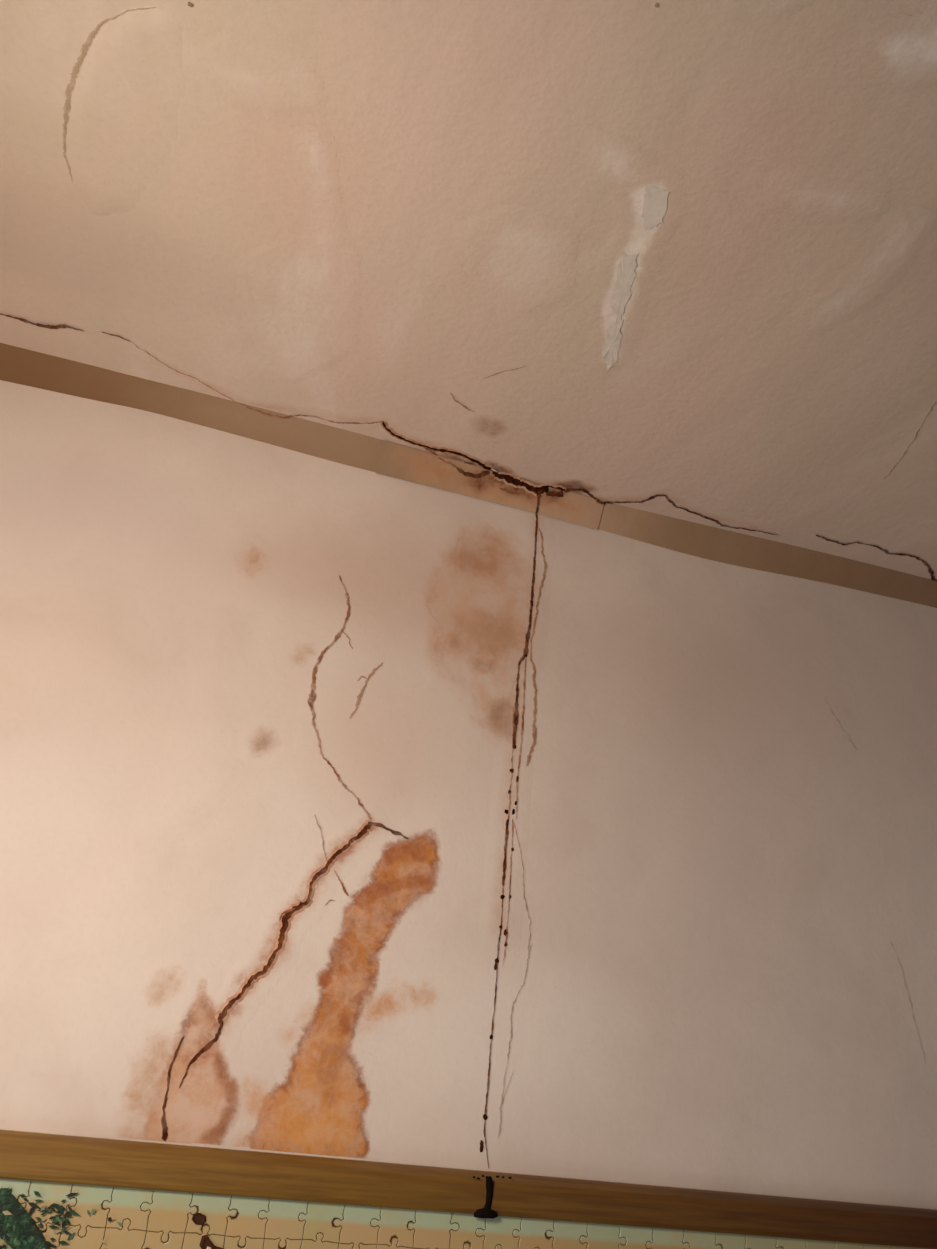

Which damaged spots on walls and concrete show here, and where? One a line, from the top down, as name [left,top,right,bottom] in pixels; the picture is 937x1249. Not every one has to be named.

peeling [577,128,688,372]
crack [0,313,778,1168]
leakage [376,406,609,757]
crack [816,535,937,581]
corrosion [236,815,458,1160]